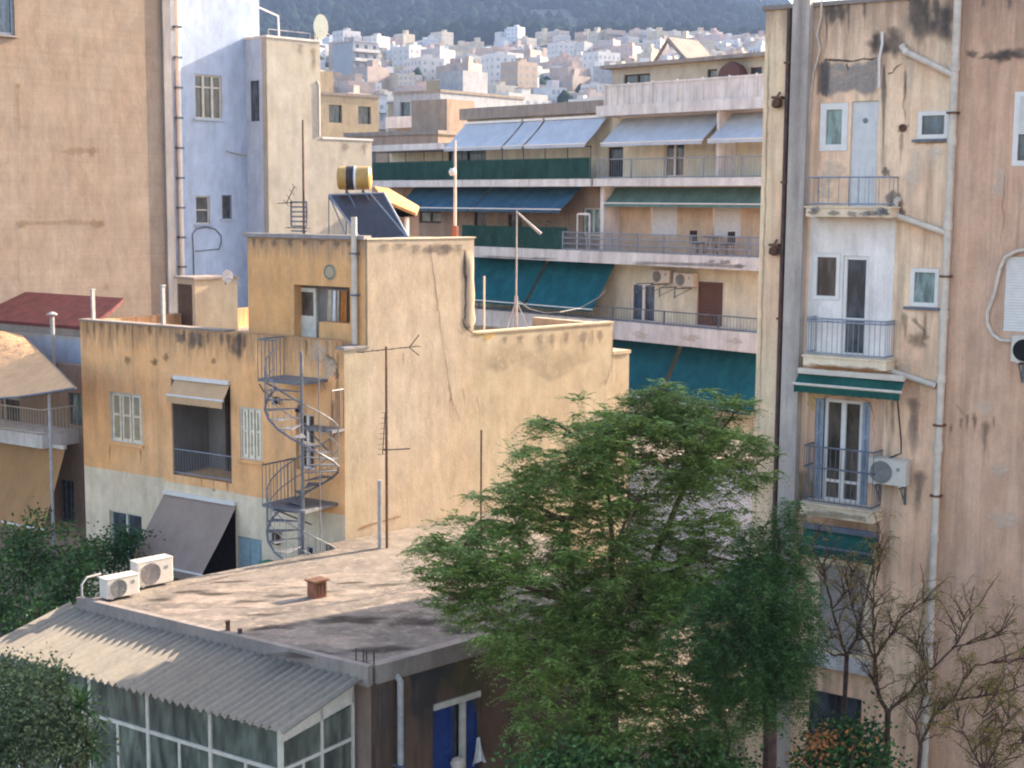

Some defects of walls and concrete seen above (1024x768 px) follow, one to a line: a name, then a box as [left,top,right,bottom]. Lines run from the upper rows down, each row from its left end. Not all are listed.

damp [969,51,1021,61]
crack [432,254,472,421]